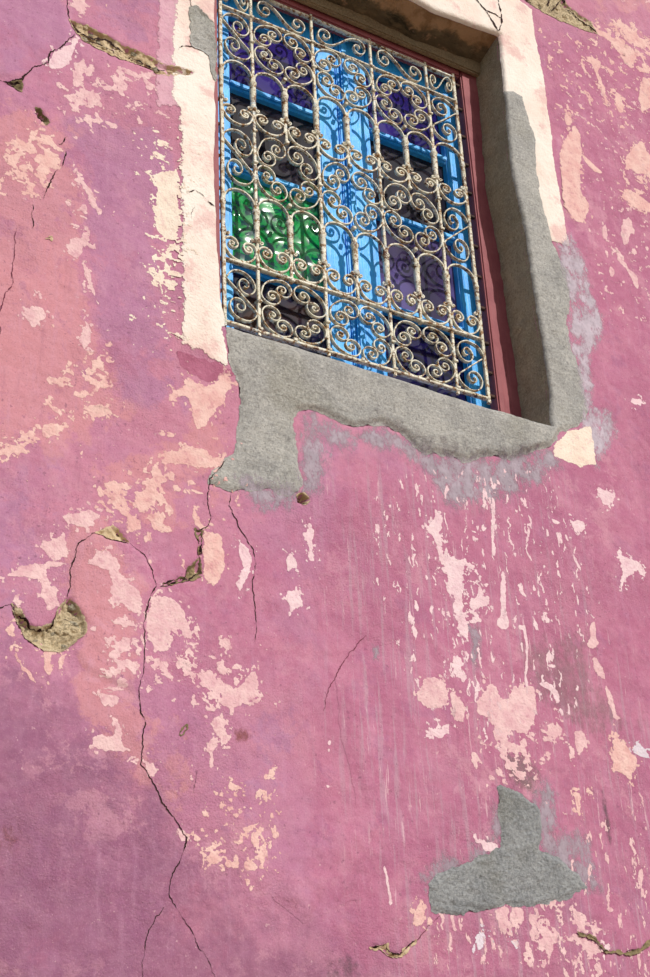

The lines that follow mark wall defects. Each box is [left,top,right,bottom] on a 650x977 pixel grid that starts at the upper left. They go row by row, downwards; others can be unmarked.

spalling [7,80,24,92]
peeling [0,107,63,199]
crack [0,0,199,84]
peeling [42,30,201,351]
peeling [526,0,650,325]
peeling [17,290,54,327]
peeling [0,309,125,463]
peeling [0,366,282,891]
crack [67,459,257,977]
peeling [373,426,650,977]
crack [369,916,439,958]
crack [577,931,650,956]